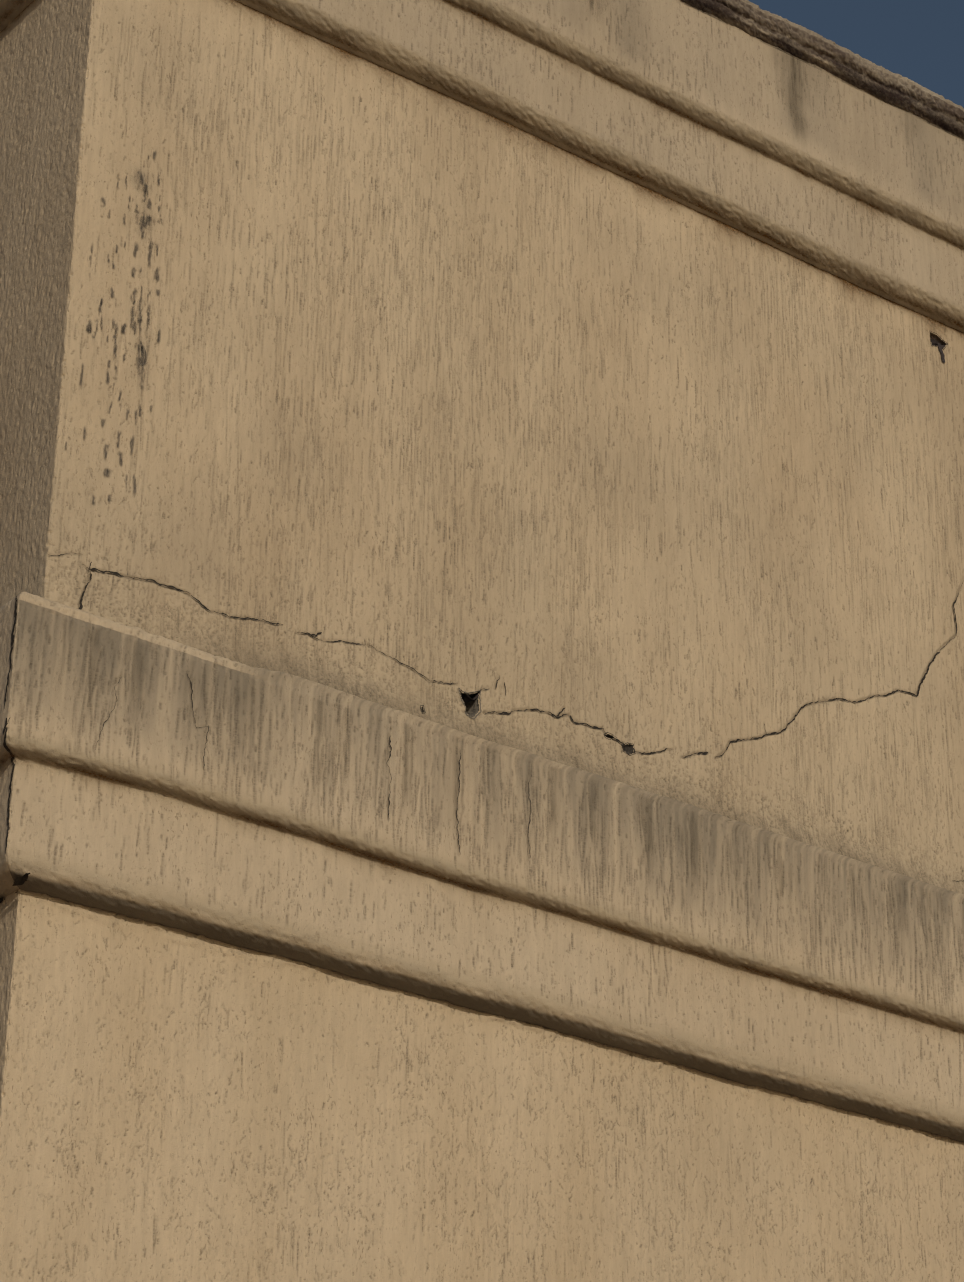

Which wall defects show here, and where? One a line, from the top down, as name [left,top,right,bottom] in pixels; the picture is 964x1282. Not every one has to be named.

damp [686,0,723,18]
damp [776,39,809,82]
damp [651,98,780,160]
damp [484,109,964,334]
damp [88,174,160,382]
crack [50,553,963,770]
spalling [459,688,482,719]
damp [55,763,133,785]
damp [308,836,506,897]
damp [672,946,907,1016]